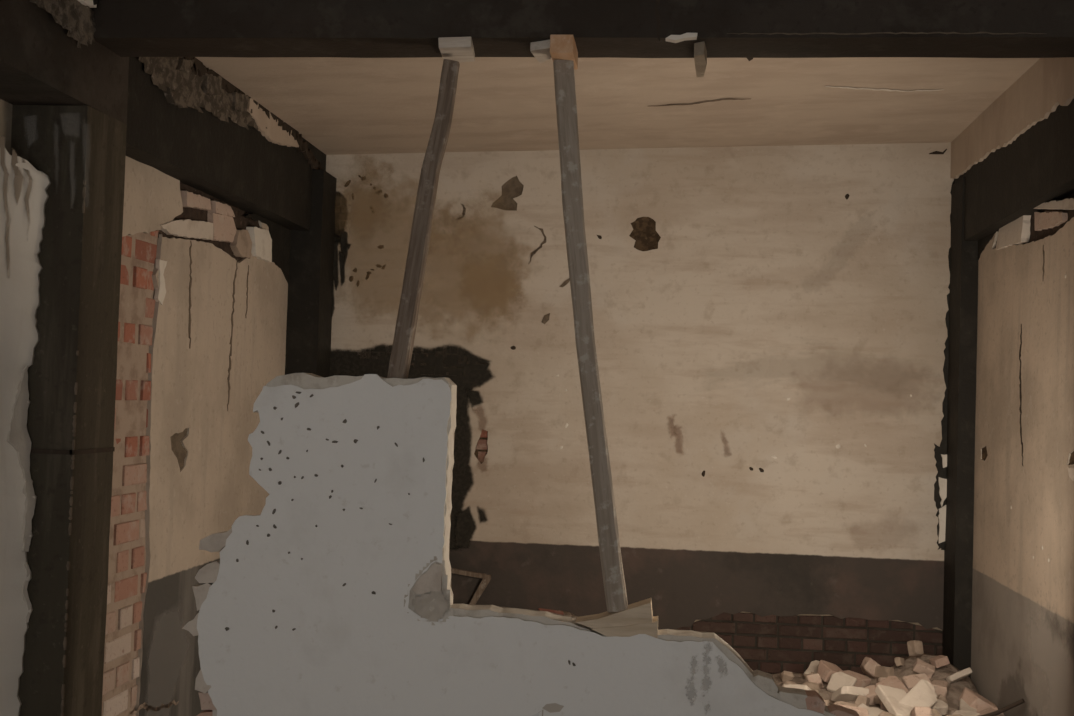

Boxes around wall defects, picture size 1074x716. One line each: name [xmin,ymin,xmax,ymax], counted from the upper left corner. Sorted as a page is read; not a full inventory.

spalling [29,0,97,49]
spalling [139,57,299,147]
flaking render [950,57,1074,179]
water stain [0,136,32,271]
crack [186,243,194,347]
crack [227,259,249,411]
water stain [332,231,386,316]
spalling [491,176,524,211]
spalling [629,217,661,251]
spalling [1016,193,1074,245]
crack [1017,324,1025,466]
flaking render [102,182,260,716]